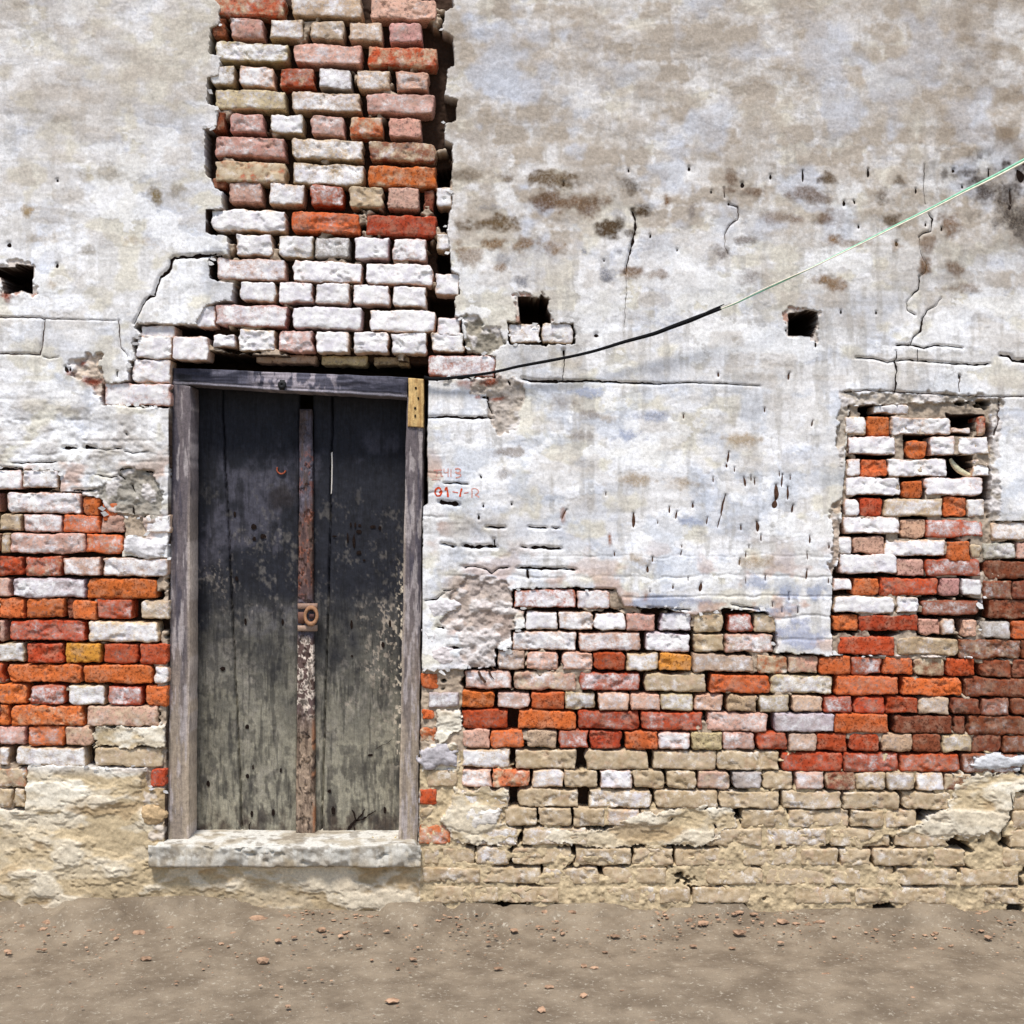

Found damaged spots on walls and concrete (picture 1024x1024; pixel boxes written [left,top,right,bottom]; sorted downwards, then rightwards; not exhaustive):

flaking render [100,0,496,409]
leakage [457,213,533,260]
leakage [528,170,634,239]
leakage [788,172,833,223]
leakage [969,176,1024,235]
crack [0,253,223,377]
crack [844,173,1024,435]
crack [523,350,757,386]
crack [4,433,154,517]
flaking render [772,471,793,513]
flaking render [0,466,173,812]
flaking render [418,521,1024,912]